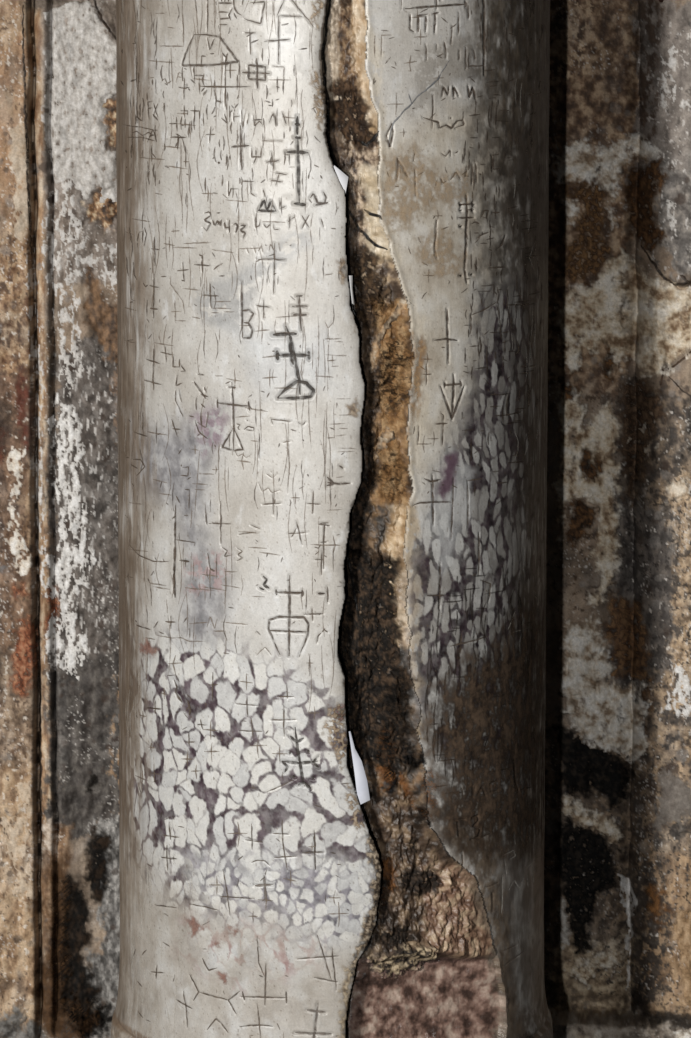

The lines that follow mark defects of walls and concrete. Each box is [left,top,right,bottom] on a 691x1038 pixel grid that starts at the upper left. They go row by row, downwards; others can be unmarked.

crack [358,60,450,146]
crack [641,245,691,286]
crack [322,0,388,864]
crack [660,351,691,398]
water stain [37,829,112,1038]
crack [346,889,381,1038]